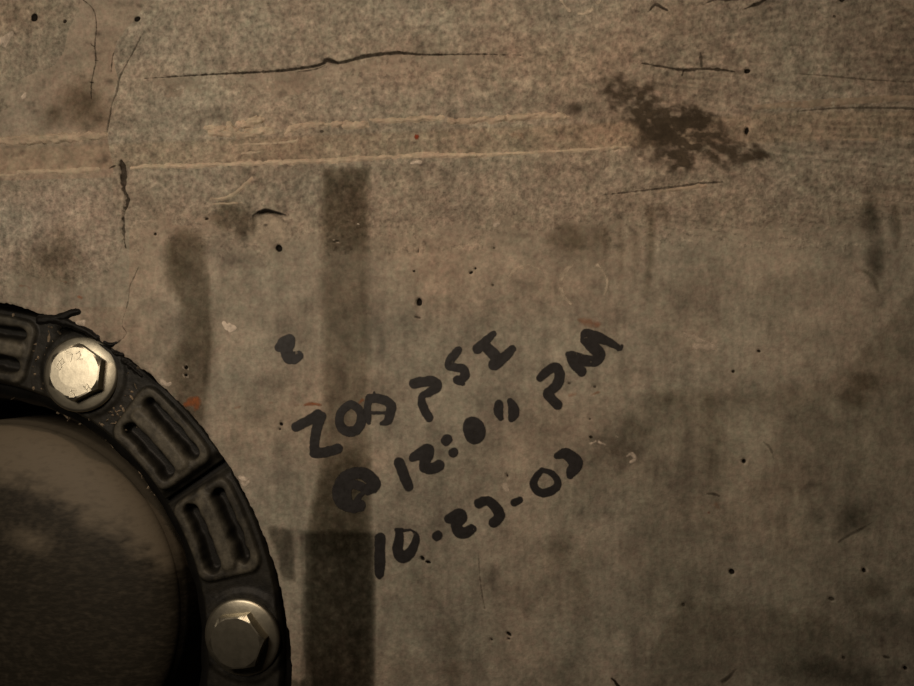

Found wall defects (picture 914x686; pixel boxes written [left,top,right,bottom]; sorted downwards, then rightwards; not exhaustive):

crack [169,51,521,77]
crack [642,53,735,75]
crack [110,160,130,248]